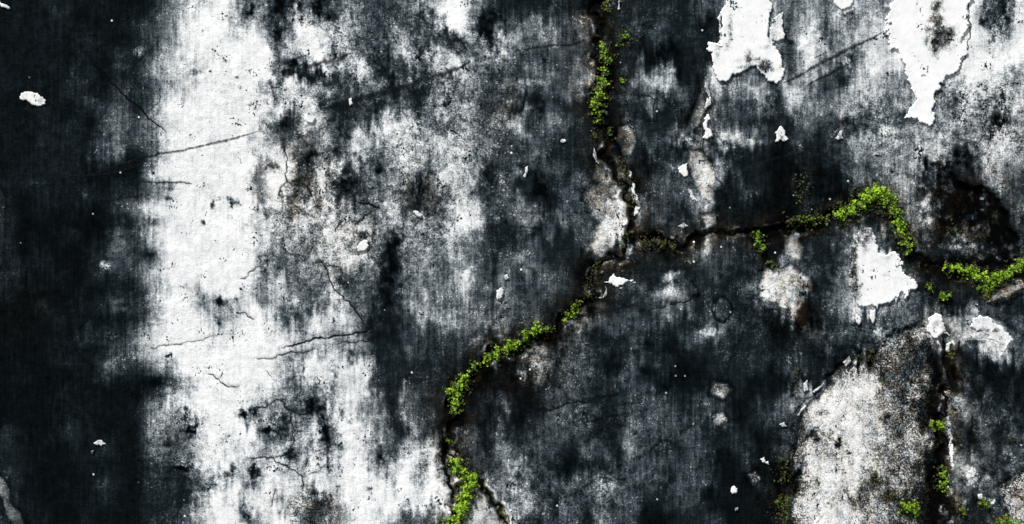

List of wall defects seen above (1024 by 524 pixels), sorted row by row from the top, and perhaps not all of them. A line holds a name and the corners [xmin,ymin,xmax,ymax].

crack [95,66,165,131]
peeling [678,0,785,228]
peeling [883,0,971,126]
water stain [0,0,200,524]
crack [254,259,384,359]
crack [441,3,1024,524]
peeling [849,227,918,325]
crack [248,399,324,489]
flaking render [779,313,1024,524]